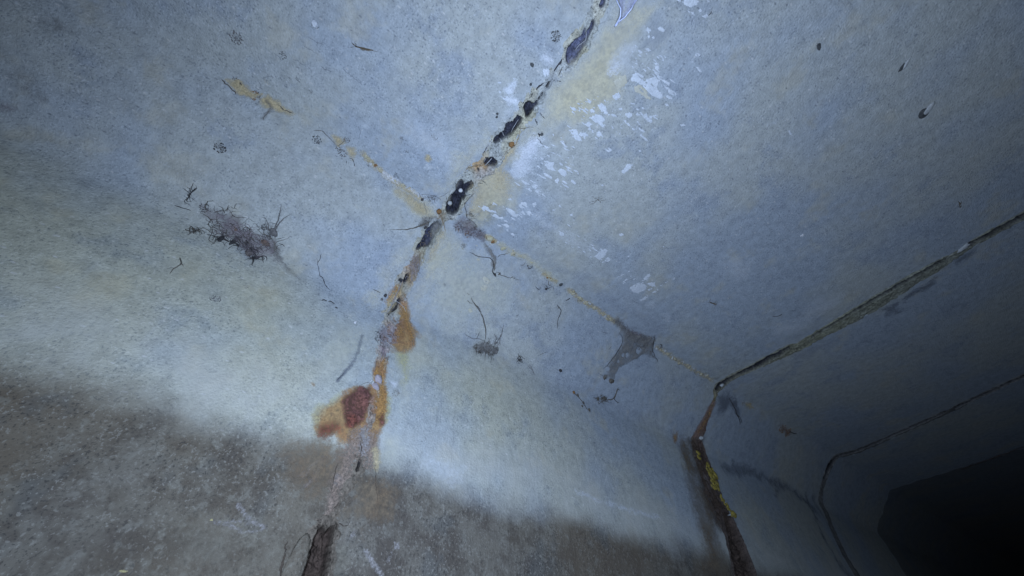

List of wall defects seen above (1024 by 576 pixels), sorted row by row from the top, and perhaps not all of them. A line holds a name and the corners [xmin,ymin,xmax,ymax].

spalling [566,19,595,66]
water stain [554,31,623,118]
peeling [479,27,677,236]
spalling [416,157,498,250]
rust [383,286,418,352]
rust [315,358,390,443]
rust [690,400,727,529]